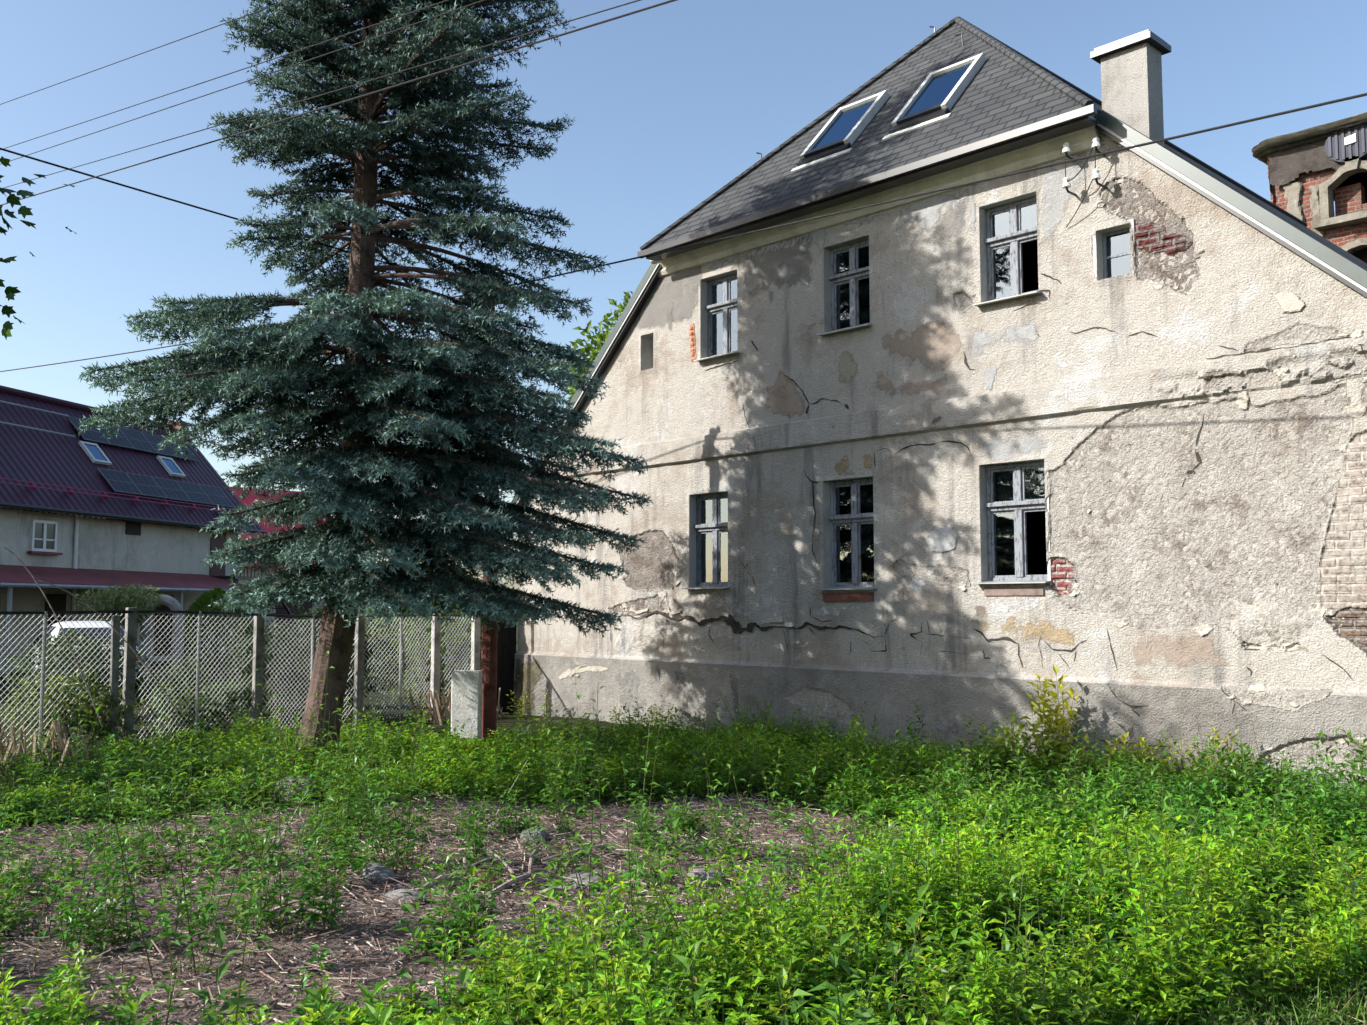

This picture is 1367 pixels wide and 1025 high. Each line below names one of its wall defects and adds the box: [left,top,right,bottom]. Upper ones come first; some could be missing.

flaking render [1095,177,1204,295]
crack [1181,415,1204,488]
flaking render [1045,293,1367,656]
flaking render [609,530,683,620]
flaking render [784,686,854,724]
crack [610,594,1168,747]